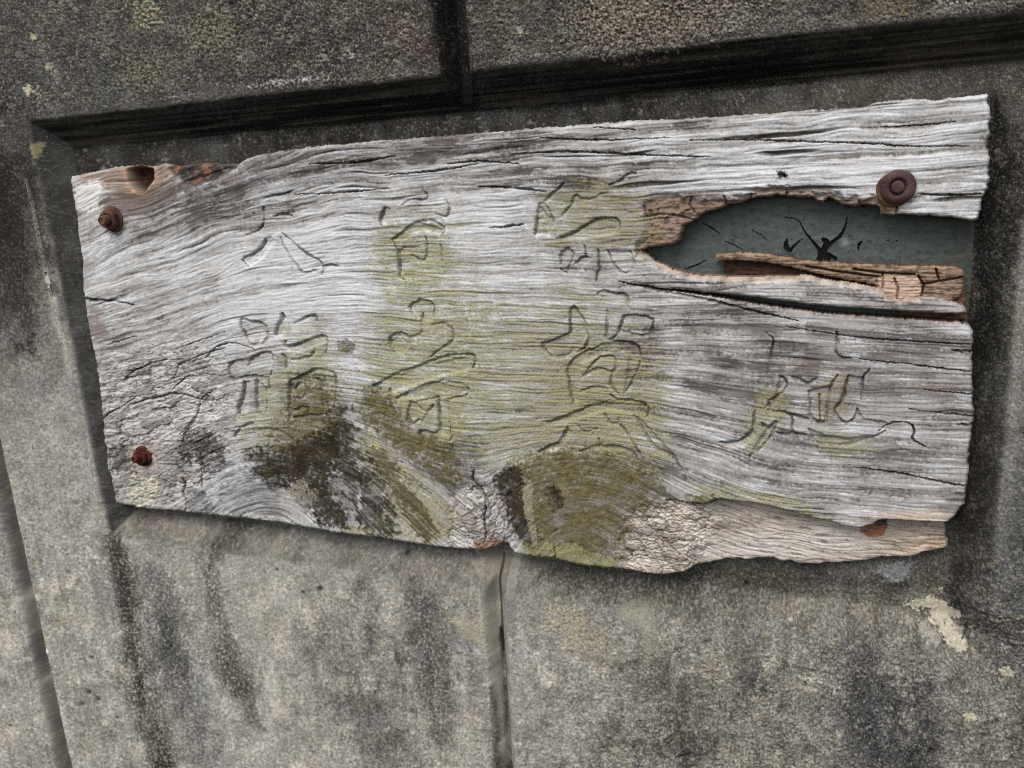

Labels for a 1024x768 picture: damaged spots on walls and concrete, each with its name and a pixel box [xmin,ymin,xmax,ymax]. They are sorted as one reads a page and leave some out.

water stain [411,598,442,742]
peeling [902,586,967,653]